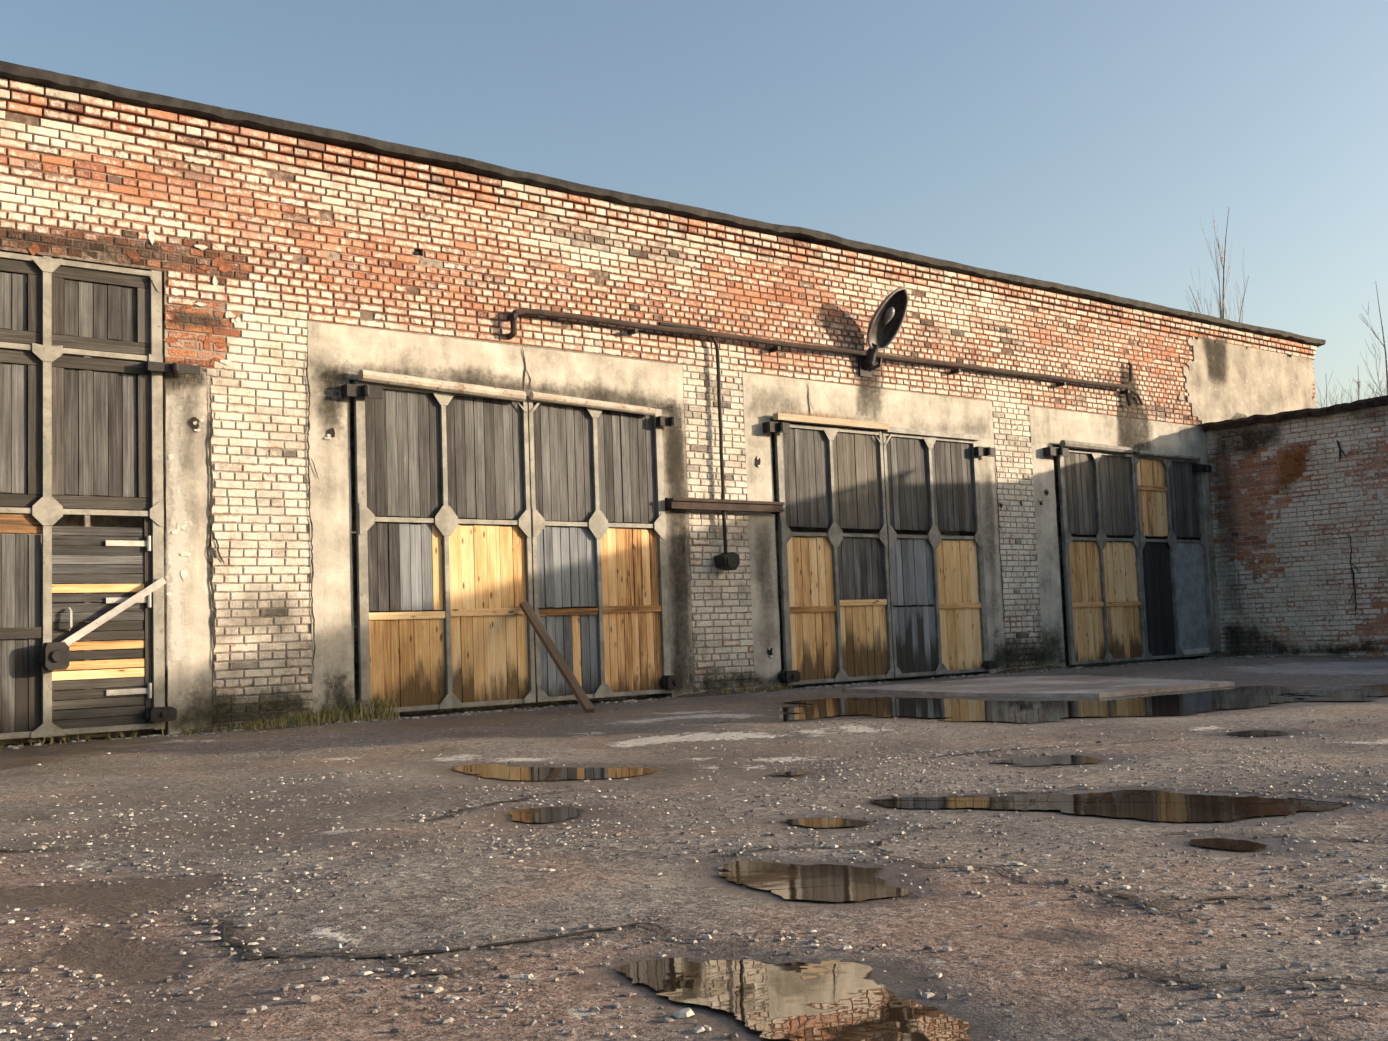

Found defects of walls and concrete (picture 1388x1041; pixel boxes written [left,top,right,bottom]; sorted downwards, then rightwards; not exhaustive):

spalling [0,228,252,375]
damp [1118,370,1149,451]
peeling [1332,436,1388,501]
peeling [1208,441,1316,584]
peeling [1340,588,1388,655]
crack [381,953,471,976]